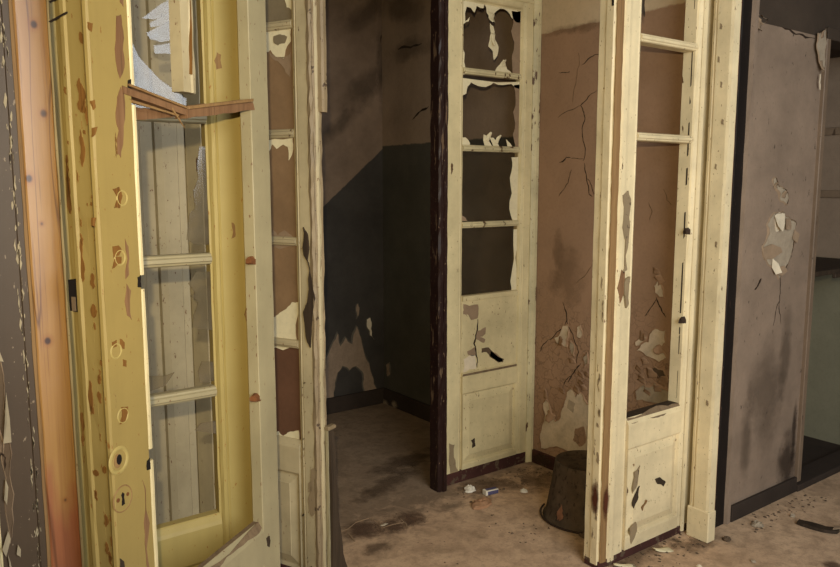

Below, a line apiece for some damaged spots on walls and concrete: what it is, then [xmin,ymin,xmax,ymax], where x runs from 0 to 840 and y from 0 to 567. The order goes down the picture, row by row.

crack [559,53,599,196]
peeling [761,176,800,279]
flaking render [325,303,377,398]
crack [541,304,580,386]
flaking render [539,324,589,451]
peeling [635,328,670,404]